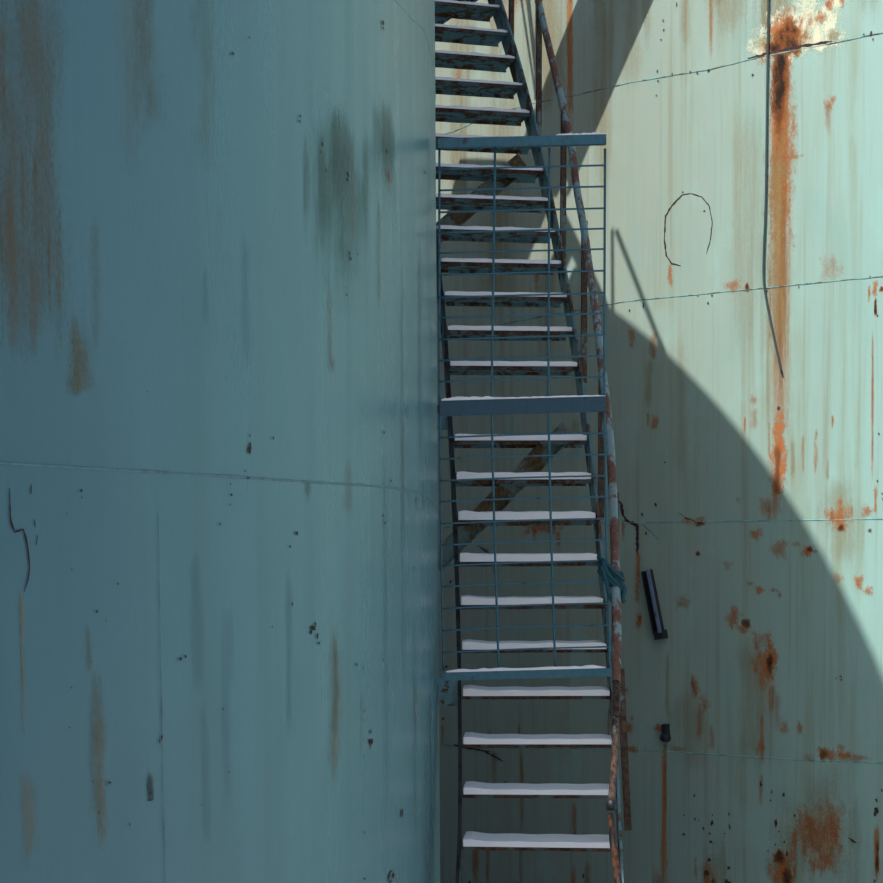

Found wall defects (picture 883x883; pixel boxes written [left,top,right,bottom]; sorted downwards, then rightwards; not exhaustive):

peeling [747,0,848,63]
corrosion [766,52,795,355]
corrosion [764,406,787,513]
crack [9,484,38,592]
corrosion [830,500,849,531]
corrosion [729,608,750,633]
corrosion [753,640,777,708]
corrosion [768,828,797,883]